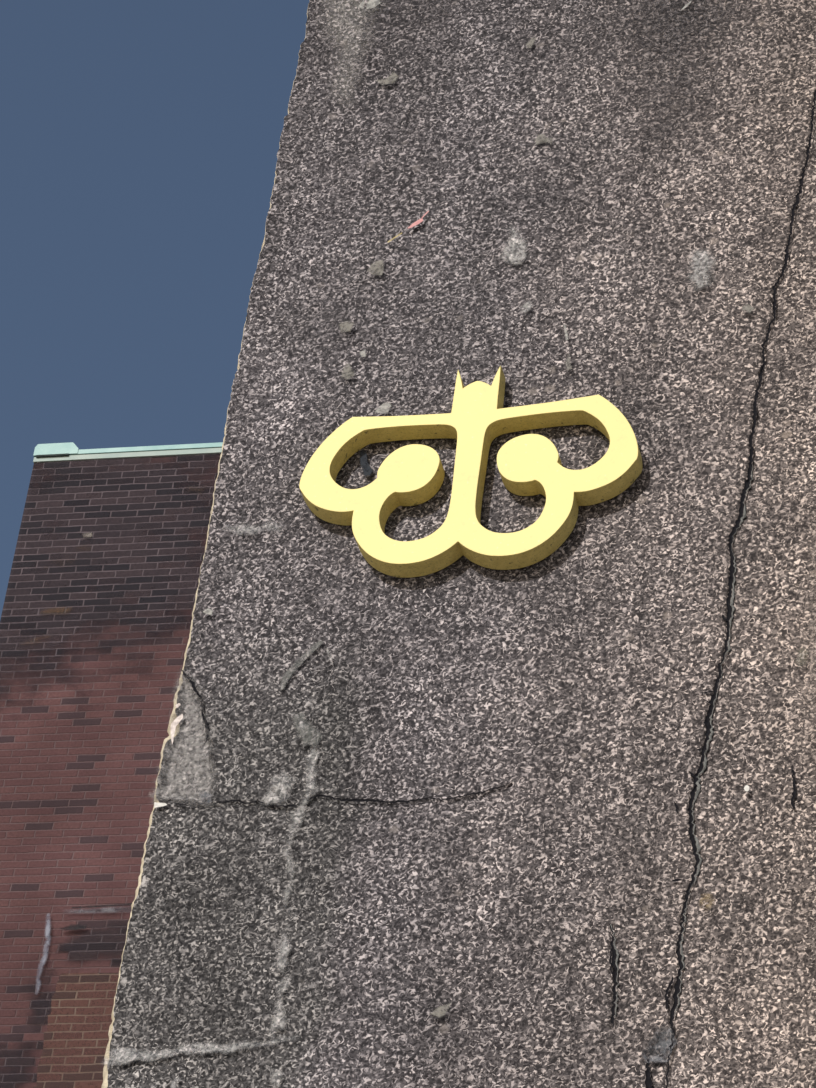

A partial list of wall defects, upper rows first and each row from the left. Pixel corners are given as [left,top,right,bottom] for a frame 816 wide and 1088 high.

crack [645,90,816,1088]
spalling [154,670,215,808]
crack [168,782,510,808]
crack [609,924,619,1026]